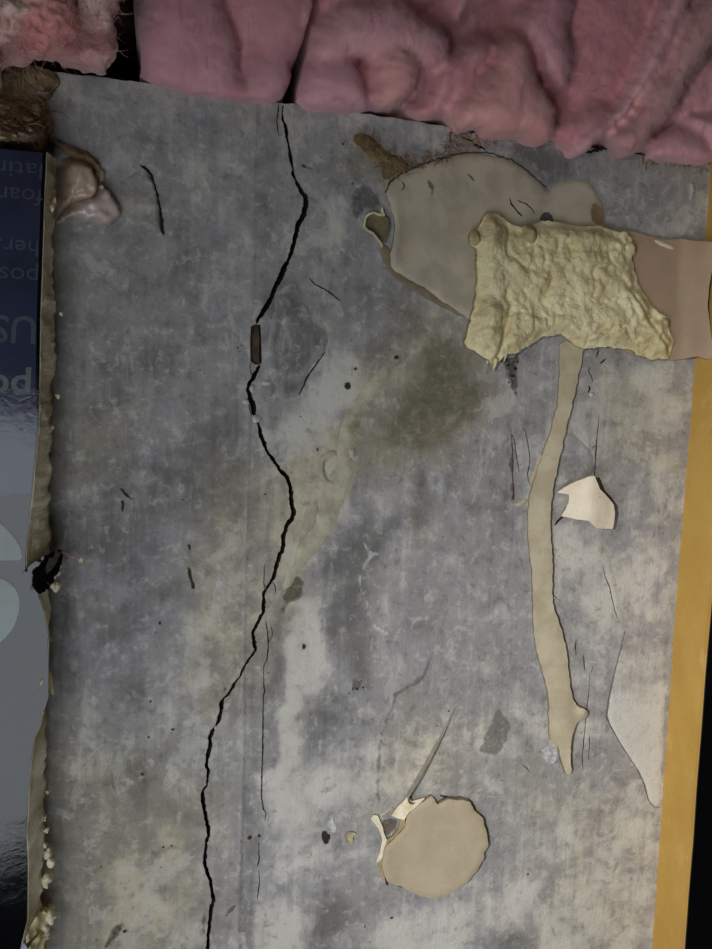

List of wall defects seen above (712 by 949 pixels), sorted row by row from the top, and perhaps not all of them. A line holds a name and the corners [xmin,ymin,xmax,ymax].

peeling [353,188,389,248]
mould [501,355,518,394]
crack [201,104,309,949]
peeling [555,433,615,529]
peeling [606,627,667,808]